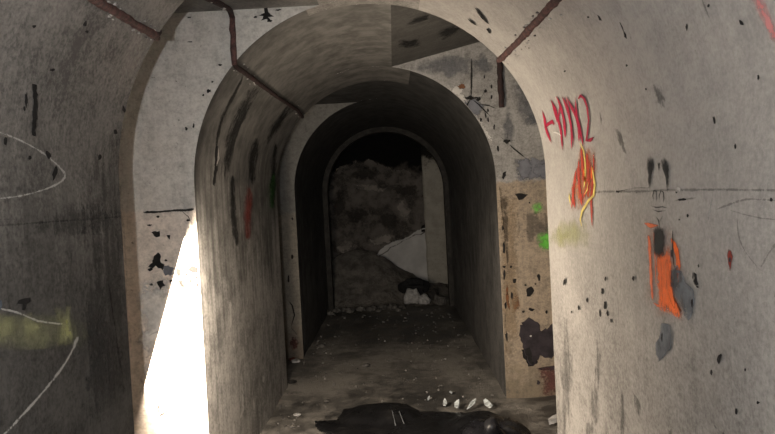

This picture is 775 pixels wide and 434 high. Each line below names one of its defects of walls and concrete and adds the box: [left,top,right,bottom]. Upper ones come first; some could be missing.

peeling [143,253,202,355]
peeling [502,266,540,309]
peeling [519,308,556,395]